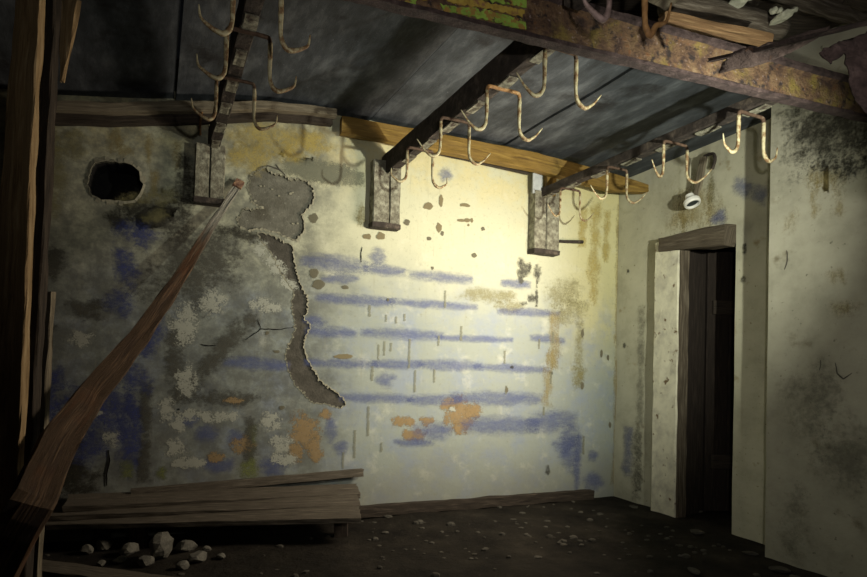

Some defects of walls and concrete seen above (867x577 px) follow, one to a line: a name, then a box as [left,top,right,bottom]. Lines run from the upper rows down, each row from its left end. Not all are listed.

spalling [84,156,146,207]
spalling [235,166,346,409]